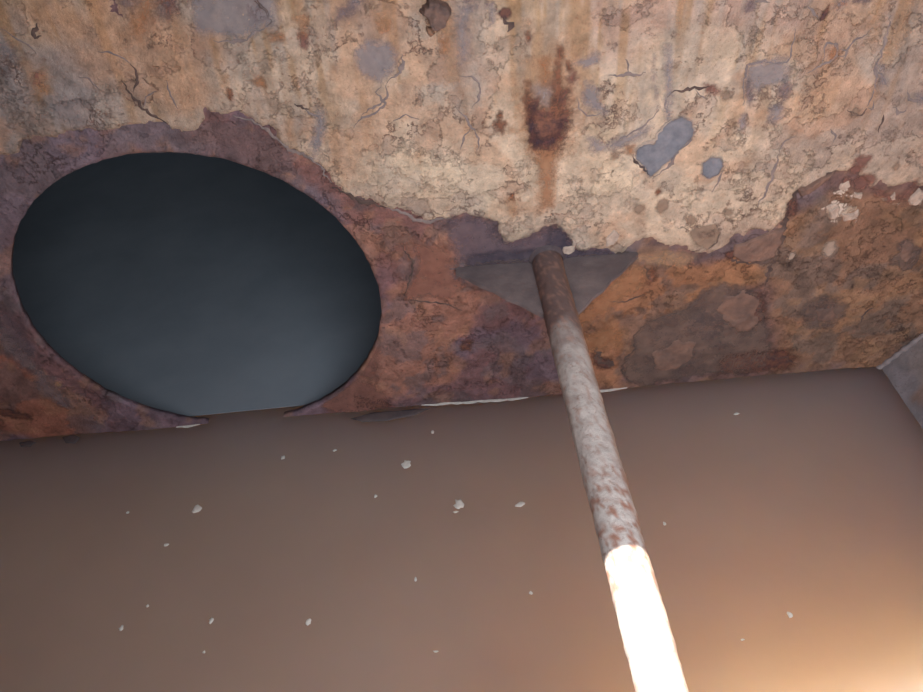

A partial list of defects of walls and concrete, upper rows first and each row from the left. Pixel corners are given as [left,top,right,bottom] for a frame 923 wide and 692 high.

crack [98,51,178,124]
crack [294,103,323,130]
crack [354,87,417,127]
peeling [0,0,923,285]
crack [456,75,481,149]
rust [494,111,506,133]
rust [524,48,576,206]
peeling [717,290,760,332]
spalling [592,324,647,386]
peeling [652,339,696,371]